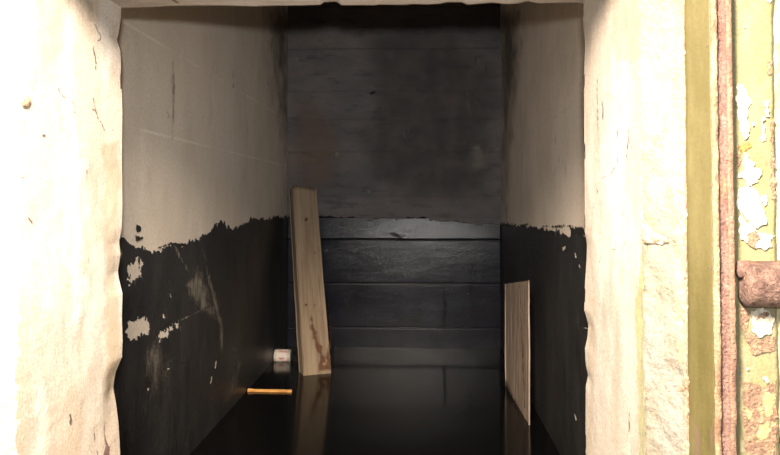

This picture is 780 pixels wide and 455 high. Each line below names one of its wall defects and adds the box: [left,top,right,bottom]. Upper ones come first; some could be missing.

peeling [735,19,780,217]
peeling [736,152,780,253]
rust [741,376,779,455]